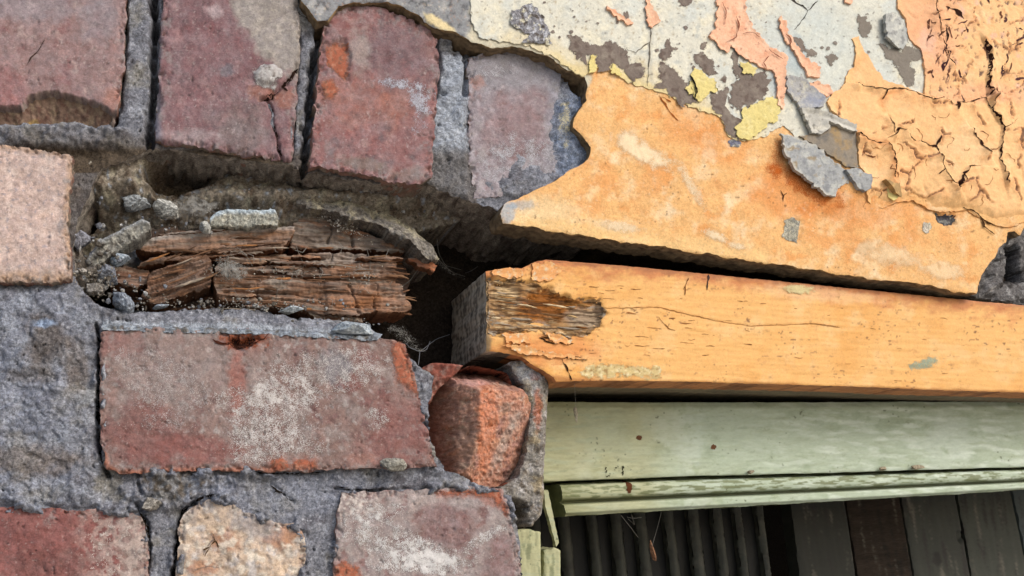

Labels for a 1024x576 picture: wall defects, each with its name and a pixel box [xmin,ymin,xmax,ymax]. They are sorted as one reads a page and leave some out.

crack [261,69,299,156]
peeling [470,0,1024,303]
crack [858,0,1024,234]
peeling [500,331,587,360]
crack [590,275,840,356]